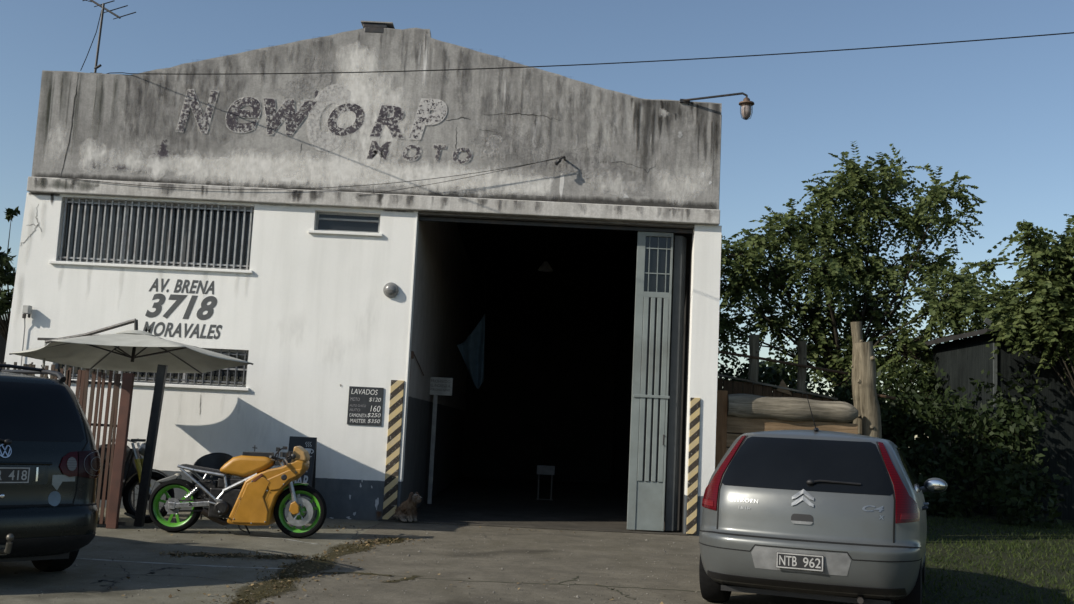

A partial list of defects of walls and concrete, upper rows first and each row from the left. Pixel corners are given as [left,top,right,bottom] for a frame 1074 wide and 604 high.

damp [418,36,427,85]
damp [634,99,676,151]
damp [692,103,719,151]
damp [29,173,716,212]